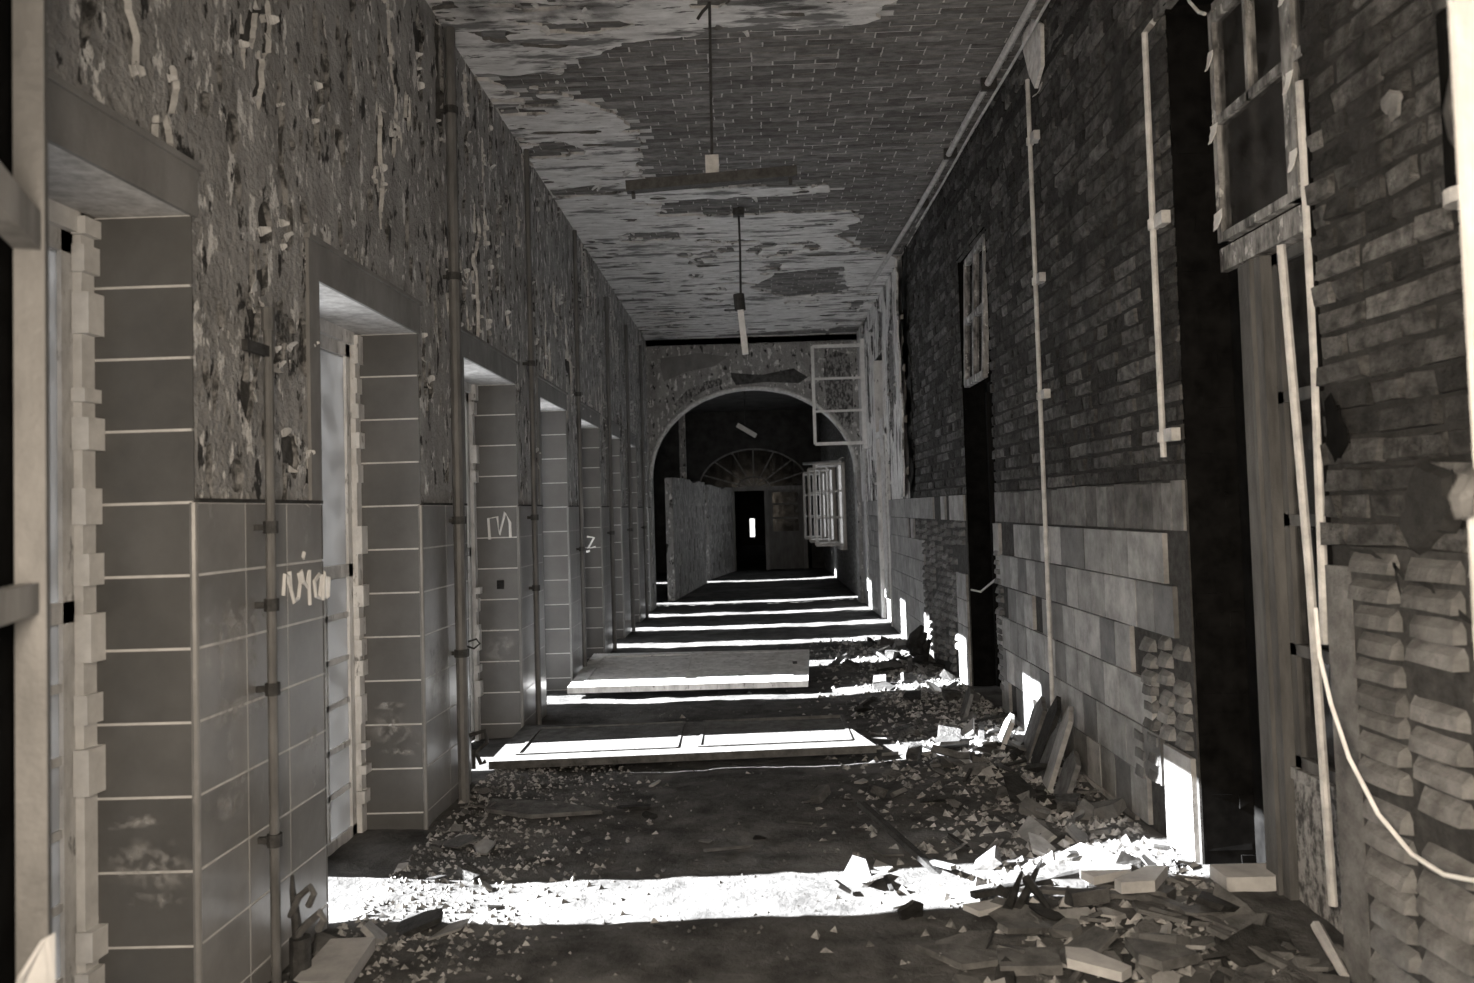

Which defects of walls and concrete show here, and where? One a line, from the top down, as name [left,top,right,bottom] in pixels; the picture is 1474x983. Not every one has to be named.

spalling [150,65,180,147]
spalling [312,13,331,162]
spalling [238,0,320,424]
spalling [364,0,1047,591]
spalling [281,426,315,507]
spalling [1324,393,1348,462]
peeling [1134,629,1196,789]